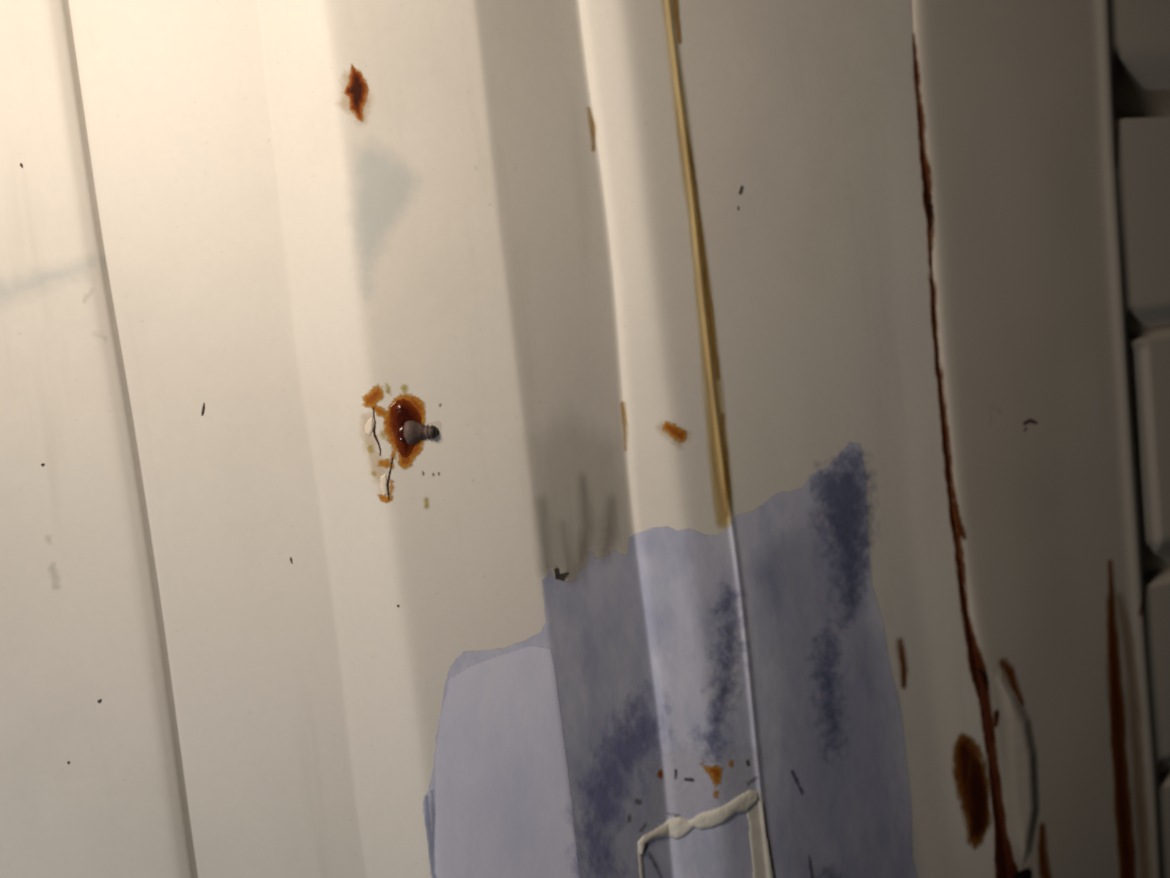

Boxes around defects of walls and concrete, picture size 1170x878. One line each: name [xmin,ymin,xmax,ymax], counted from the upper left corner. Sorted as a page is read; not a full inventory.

rust [345,66,368,121]
rust [362,385,439,503]
rust [662,421,686,442]
rust [912,34,1018,878]
rust [898,639,906,688]
rust [1000,659,1023,706]
rust [1107,561,1135,878]
rust [1039,824,1051,878]